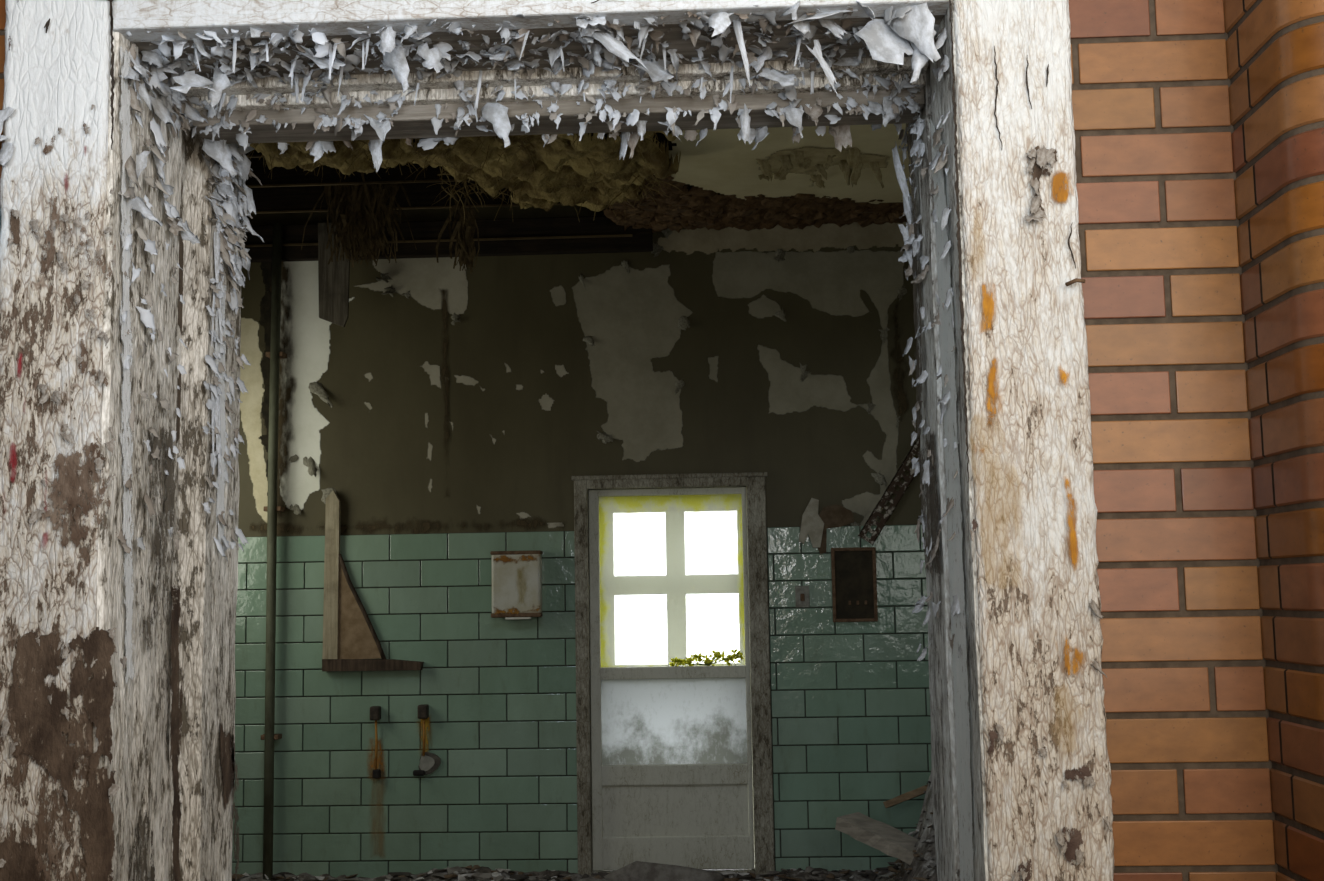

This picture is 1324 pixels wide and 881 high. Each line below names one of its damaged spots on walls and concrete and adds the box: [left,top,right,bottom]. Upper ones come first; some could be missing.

rust [1051,171,1071,203]
rust [982,284,995,331]
rust [986,358,1000,425]
peeling [0,0,978,881]
rust [1065,479,1079,568]
rust [490,550,543,579]
rust [491,606,543,618]
rust [1064,639,1084,676]
peeling [989,724,1004,753]